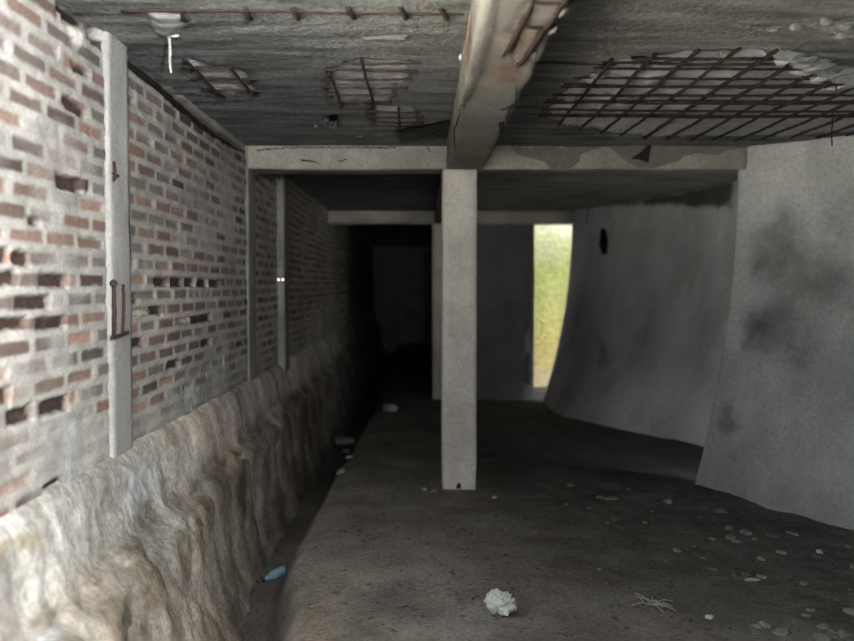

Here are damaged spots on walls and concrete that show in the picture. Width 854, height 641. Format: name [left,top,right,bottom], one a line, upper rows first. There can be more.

spalling [187,58,256,96]
spalling [328,59,451,142]
spalling [502,0,854,171]